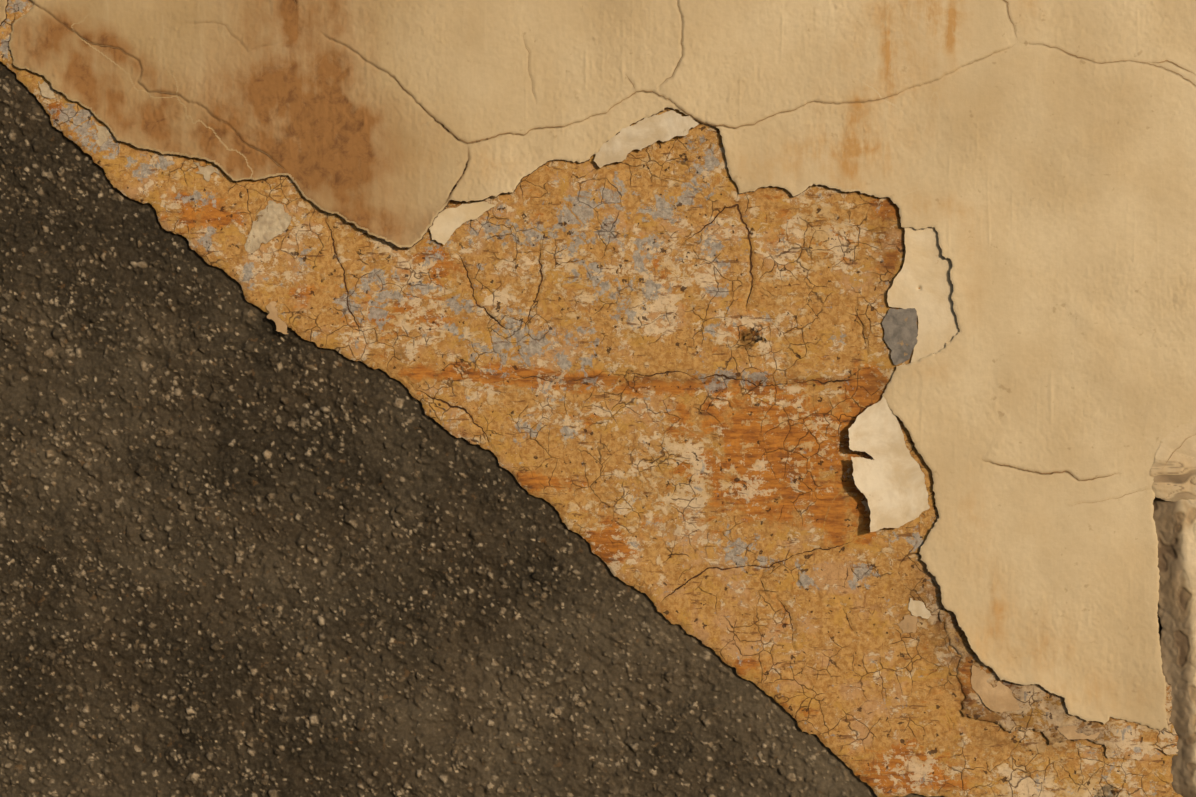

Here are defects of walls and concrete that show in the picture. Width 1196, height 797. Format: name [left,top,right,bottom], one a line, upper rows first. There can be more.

peeling [0,0,96,148]
crack [29,0,128,55]
crack [144,88,284,169]
crack [329,0,1196,209]
crack [325,220,360,334]
crack [452,236,543,333]
crack [680,204,754,310]
crack [408,382,490,445]
peeling [68,117,1183,797]
crack [513,370,861,387]
crack [979,458,1137,503]